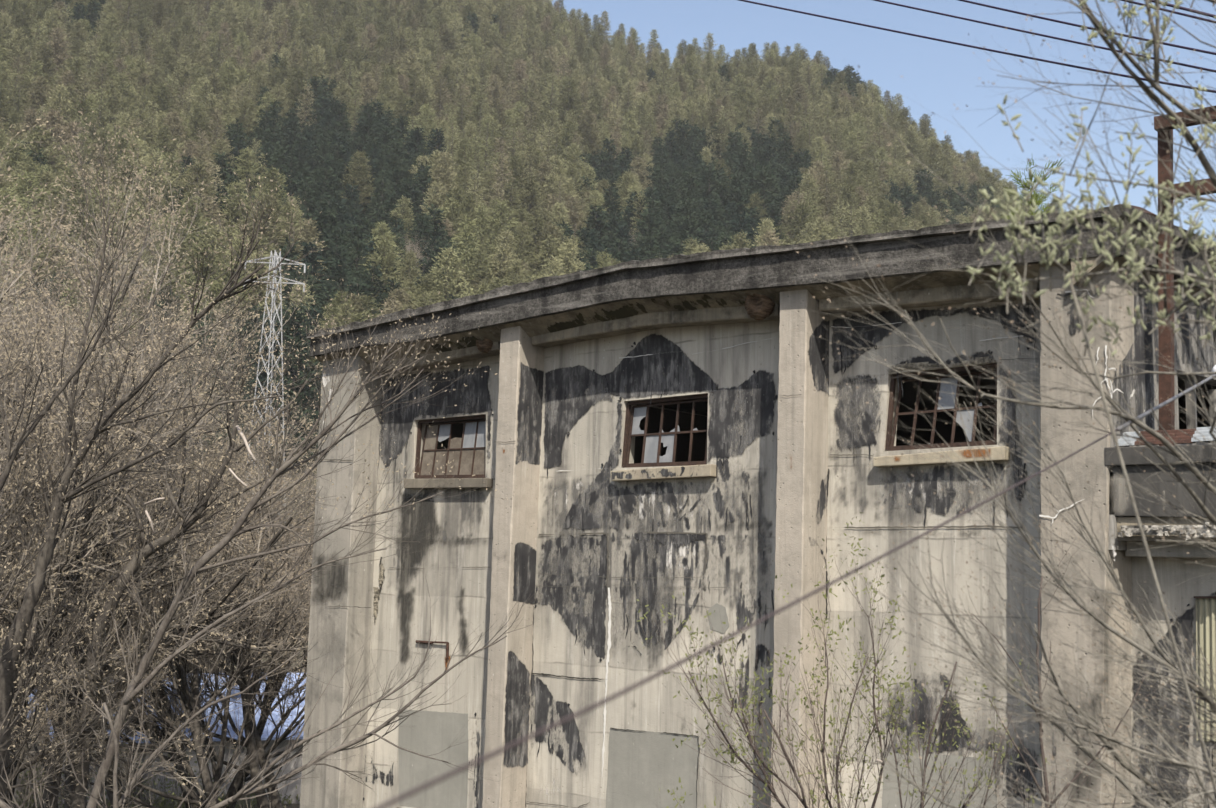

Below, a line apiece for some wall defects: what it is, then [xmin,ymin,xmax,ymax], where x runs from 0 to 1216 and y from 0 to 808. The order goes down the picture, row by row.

damp [389,401,487,661]
damp [841,383,867,512]
damp [889,467,941,520]
spalling [1117,522,1216,540]
damp [545,471,772,776]